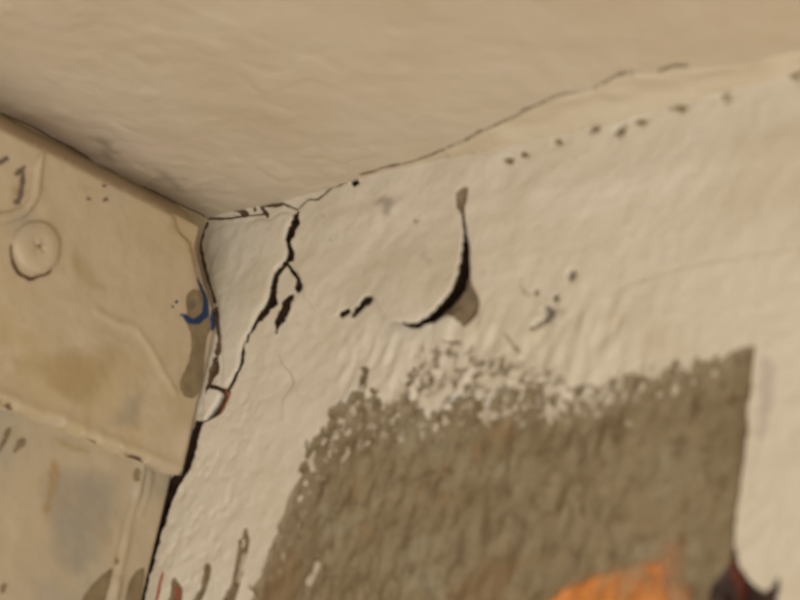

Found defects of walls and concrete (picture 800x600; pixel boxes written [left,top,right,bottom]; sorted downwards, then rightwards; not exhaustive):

crack [0,112,106,168]
crack [655,64,691,73]
crack [143,71,634,392]
crack [142,420,205,600]